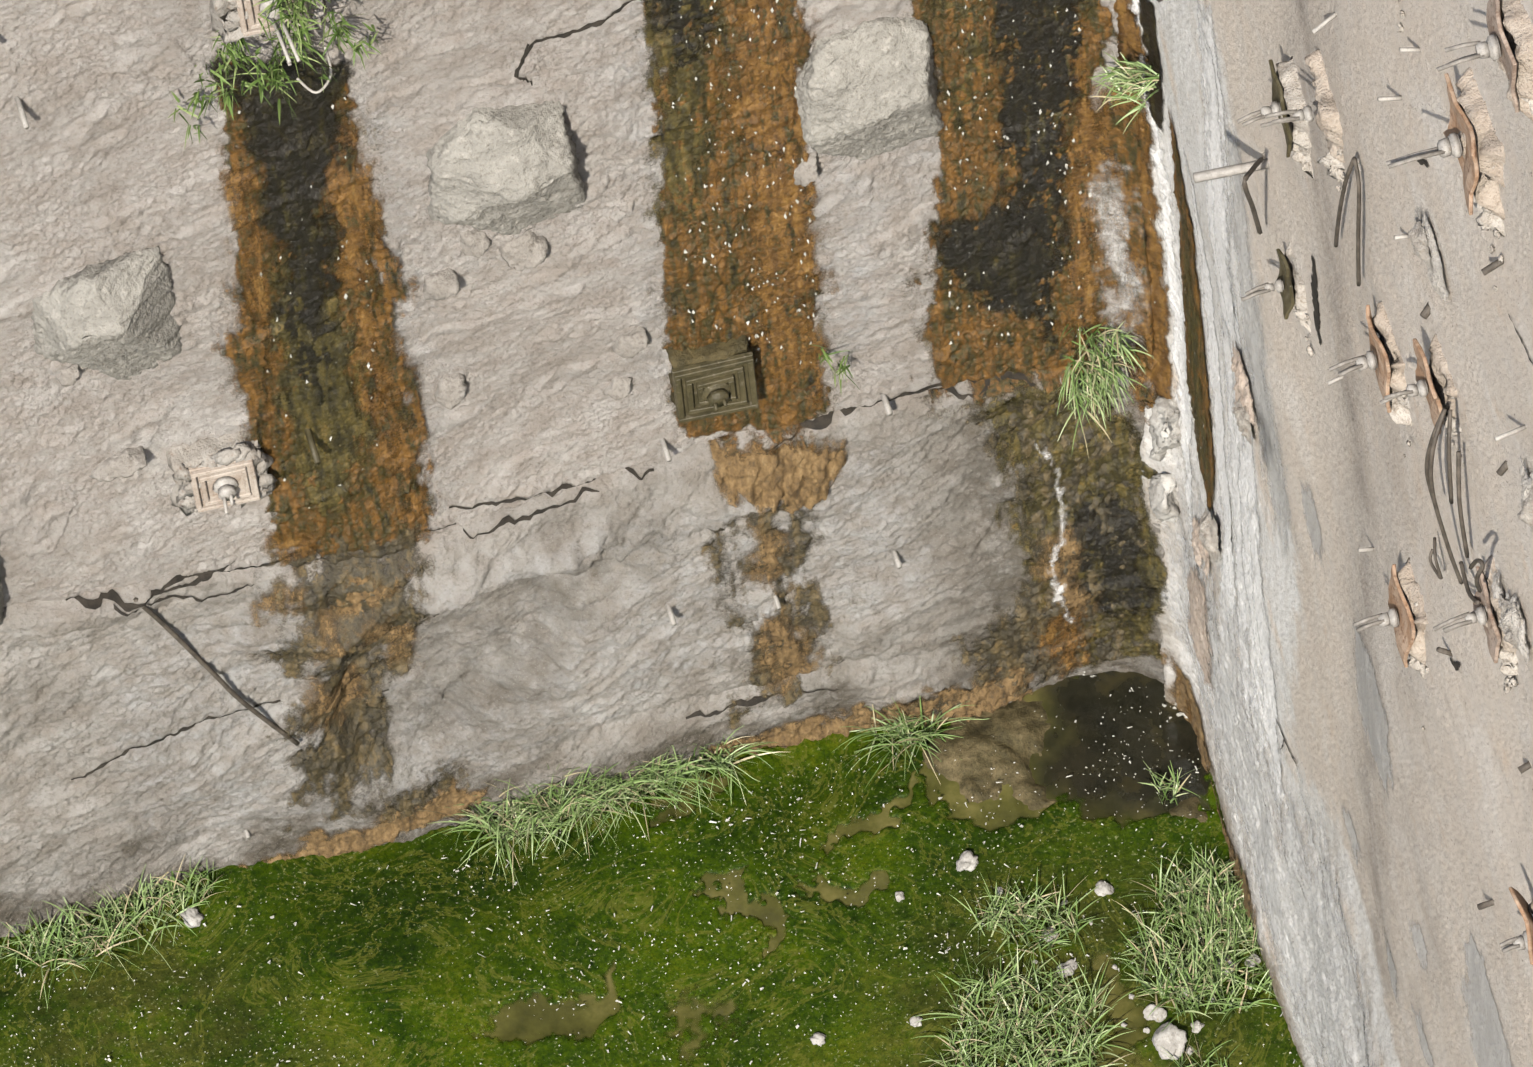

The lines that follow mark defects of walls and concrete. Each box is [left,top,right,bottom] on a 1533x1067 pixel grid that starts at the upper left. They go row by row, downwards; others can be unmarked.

spalling [1290,142,1345,181]
leakage [635,0,834,445]
spalling [1473,202,1505,237]
leakage [204,44,438,832]
crack [765,366,1035,452]
spalling [1443,415,1461,438]
crack [392,467,654,539]
leakage [903,0,1369,1067]
crack [66,552,297,617]
leakage [701,505,841,729]